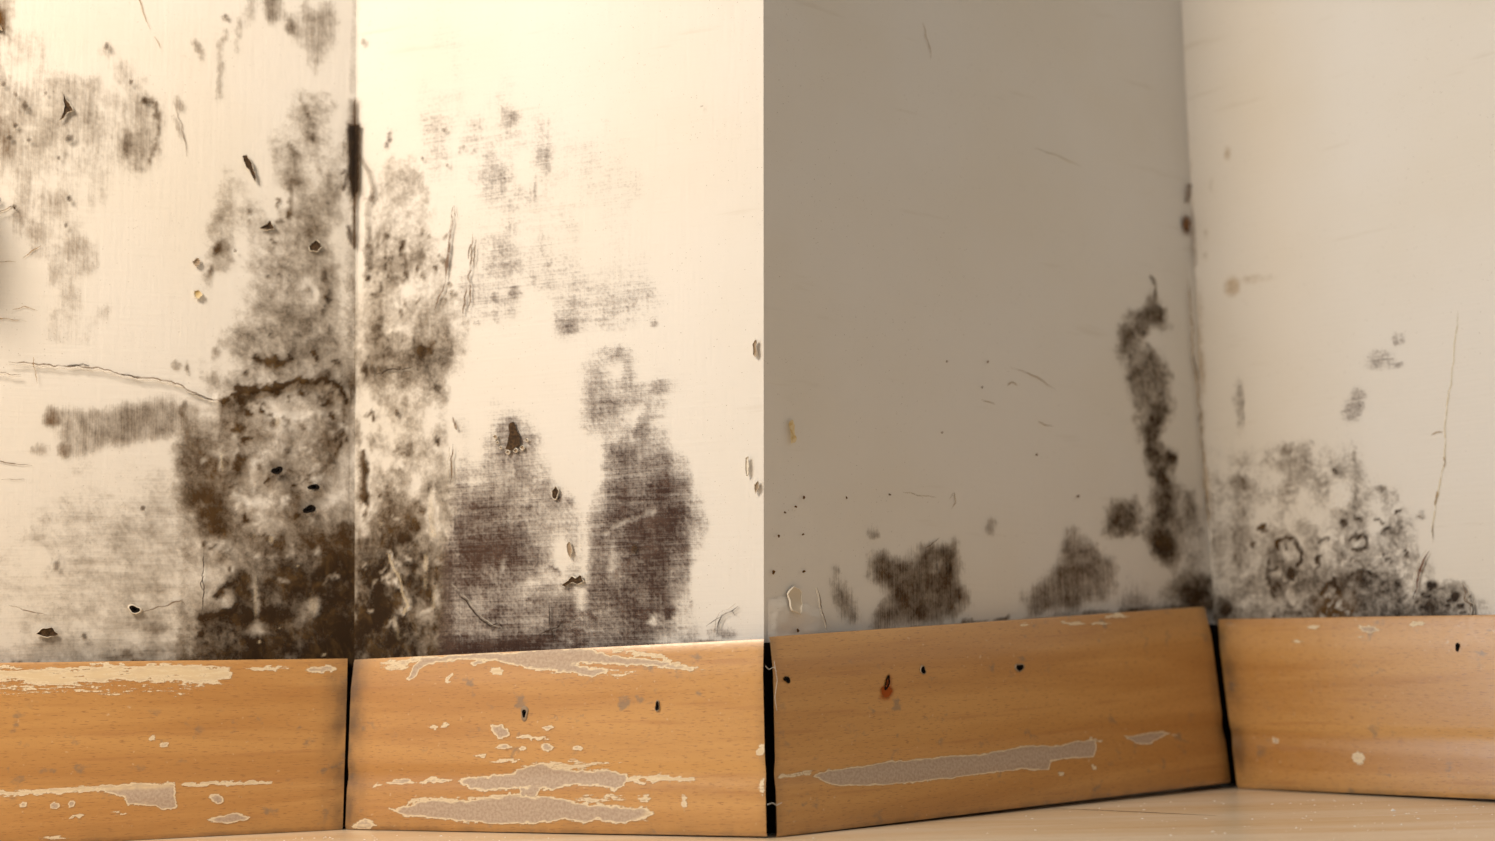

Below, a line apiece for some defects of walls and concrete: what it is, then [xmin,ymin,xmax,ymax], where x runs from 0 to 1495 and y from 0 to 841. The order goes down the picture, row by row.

leakage [0,6,8,31]
leakage [0,82,30,157]
leakage [122,80,160,169]
crack [1,357,223,403]
leakage [44,101,730,668]
leakage [1032,277,1471,625]
leakage [873,542,1009,629]
peeling [50,800,84,819]
peeling [207,794,250,824]
peeling [351,818,377,829]